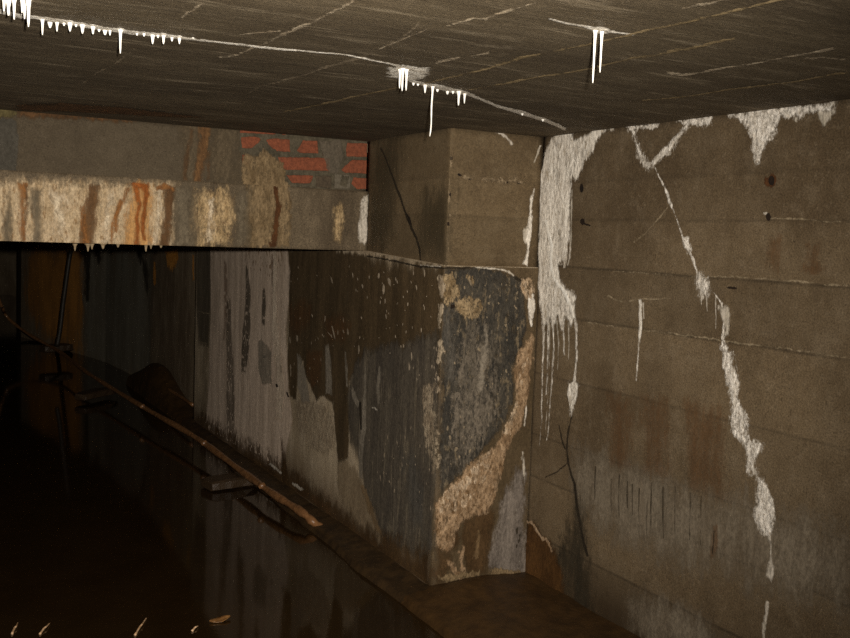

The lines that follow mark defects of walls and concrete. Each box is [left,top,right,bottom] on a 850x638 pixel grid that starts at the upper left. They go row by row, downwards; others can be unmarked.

crack [0,0,845,130]
corrosion [19,183,27,241]
corrosion [79,185,98,243]
corrosion [111,181,179,270]
flaking render [238,130,367,190]
crack [367,148,521,281]
water stain [728,101,835,164]
water stain [0,118,613,586]
peeling [345,254,527,572]
water stain [557,116,850,613]
crack [545,415,589,556]
water stain [630,596,711,638]